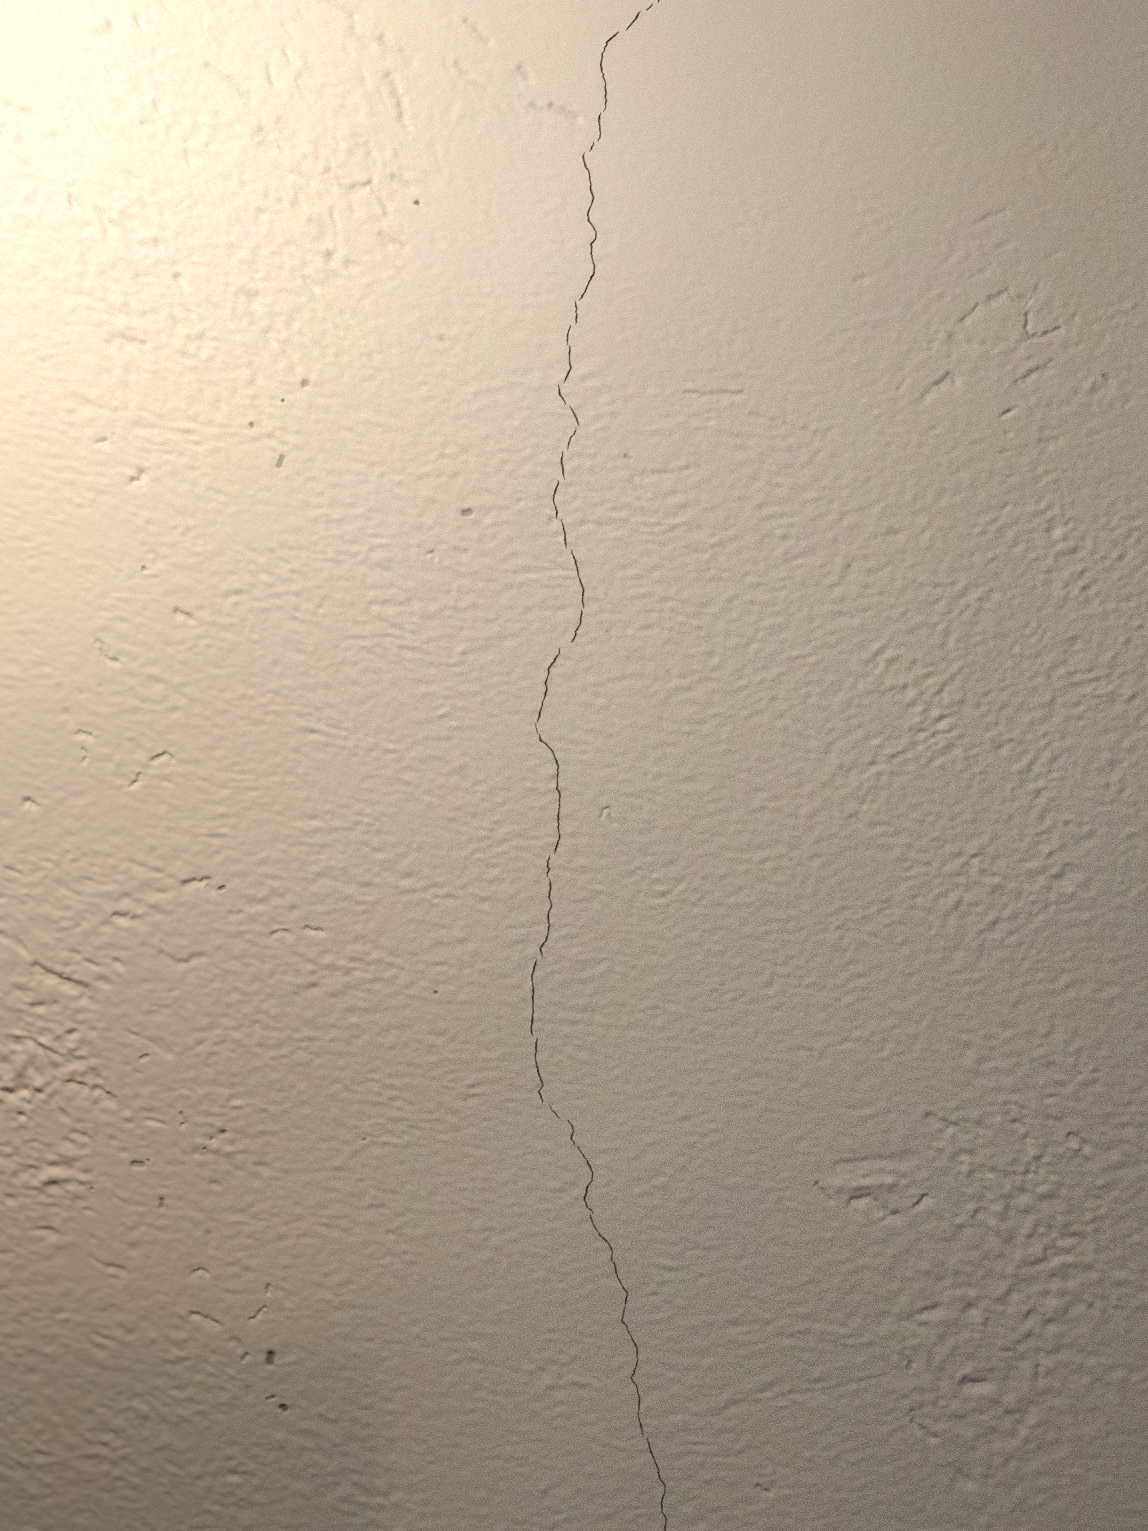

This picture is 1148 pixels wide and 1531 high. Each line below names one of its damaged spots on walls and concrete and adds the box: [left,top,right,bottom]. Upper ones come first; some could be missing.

crack [530,0,667,1531]